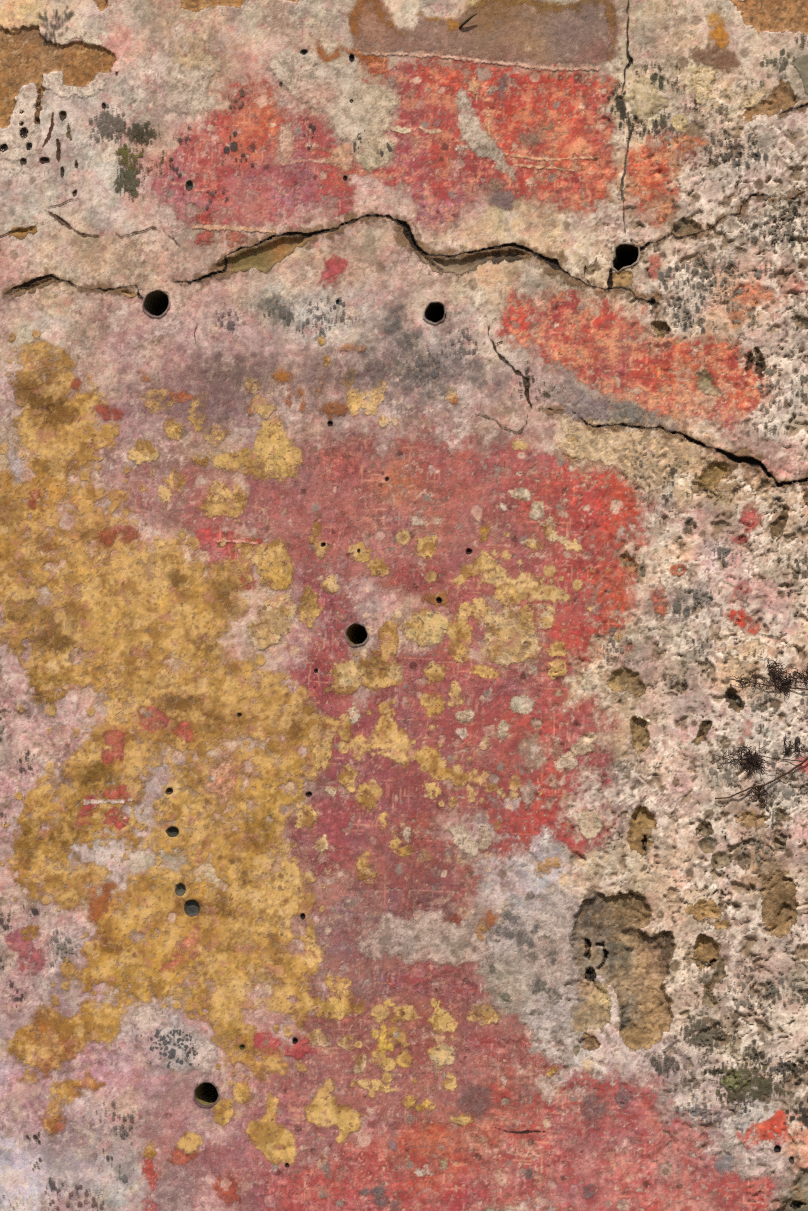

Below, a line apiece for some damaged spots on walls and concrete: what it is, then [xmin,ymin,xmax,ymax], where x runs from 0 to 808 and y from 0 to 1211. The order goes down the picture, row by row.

crack [621,0,633,92]
flaking render [730,0,808,34]
flaking render [0,25,118,177]
crack [2,267,143,300]
crack [0,198,180,246]
crack [173,207,666,316]
crack [619,126,807,258]
crack [472,318,808,489]
peeling [553,732,598,770]
peeling [449,821,500,857]
flaking render [303,883,677,1112]
flaking render [685,899,730,1008]